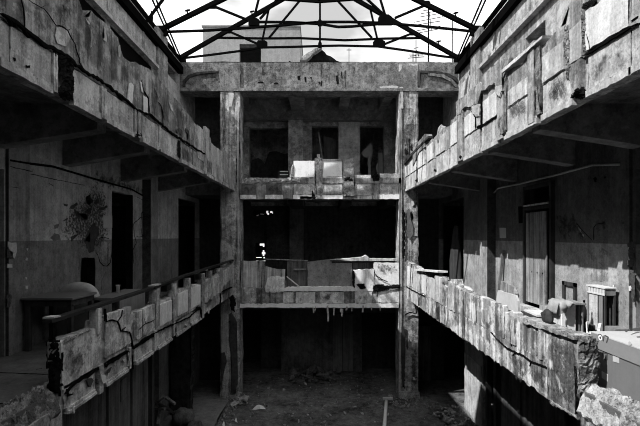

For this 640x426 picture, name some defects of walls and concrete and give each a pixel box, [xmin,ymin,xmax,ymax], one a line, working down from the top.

spalling [57,53,76,102]
crack [0,0,206,155]
peeling [51,194,111,290]
spalling [0,338,64,426]
crack [64,307,203,397]
crack [490,319,547,368]
spalling [550,336,640,426]